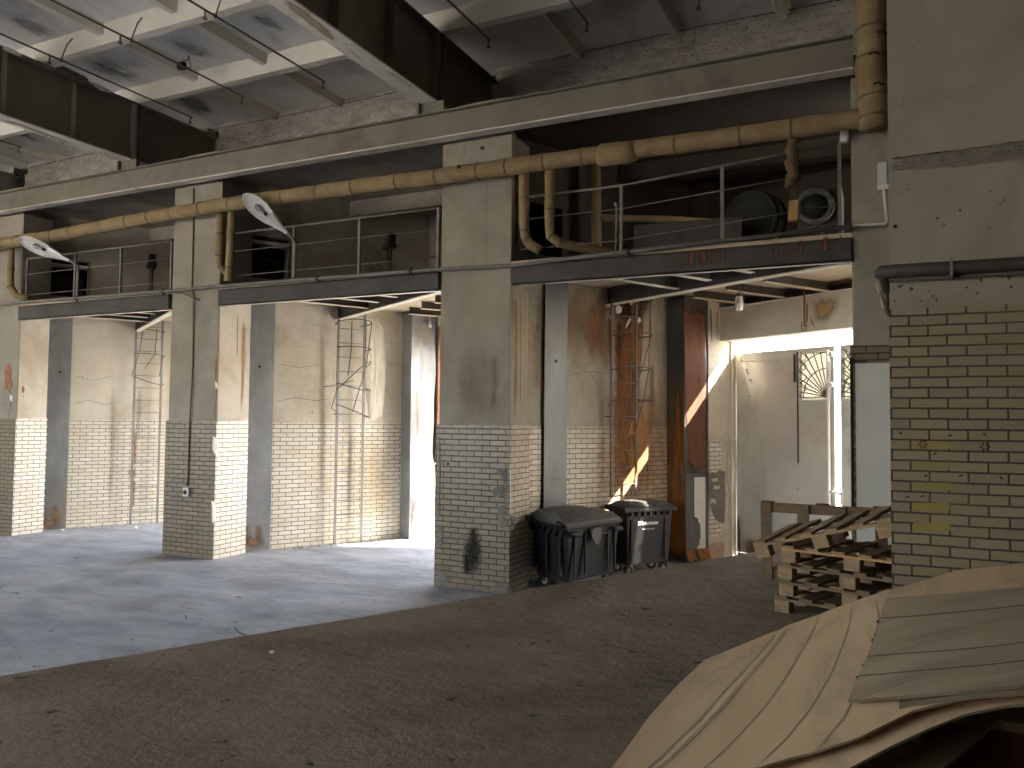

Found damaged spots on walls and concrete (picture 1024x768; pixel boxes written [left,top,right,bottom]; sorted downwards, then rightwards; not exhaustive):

rust [237,320,245,395]
rust [573,297,654,483]
rust [667,307,718,556]
spalling [492,468,517,528]
spalling [709,471,726,523]
damp [464,528,480,573]